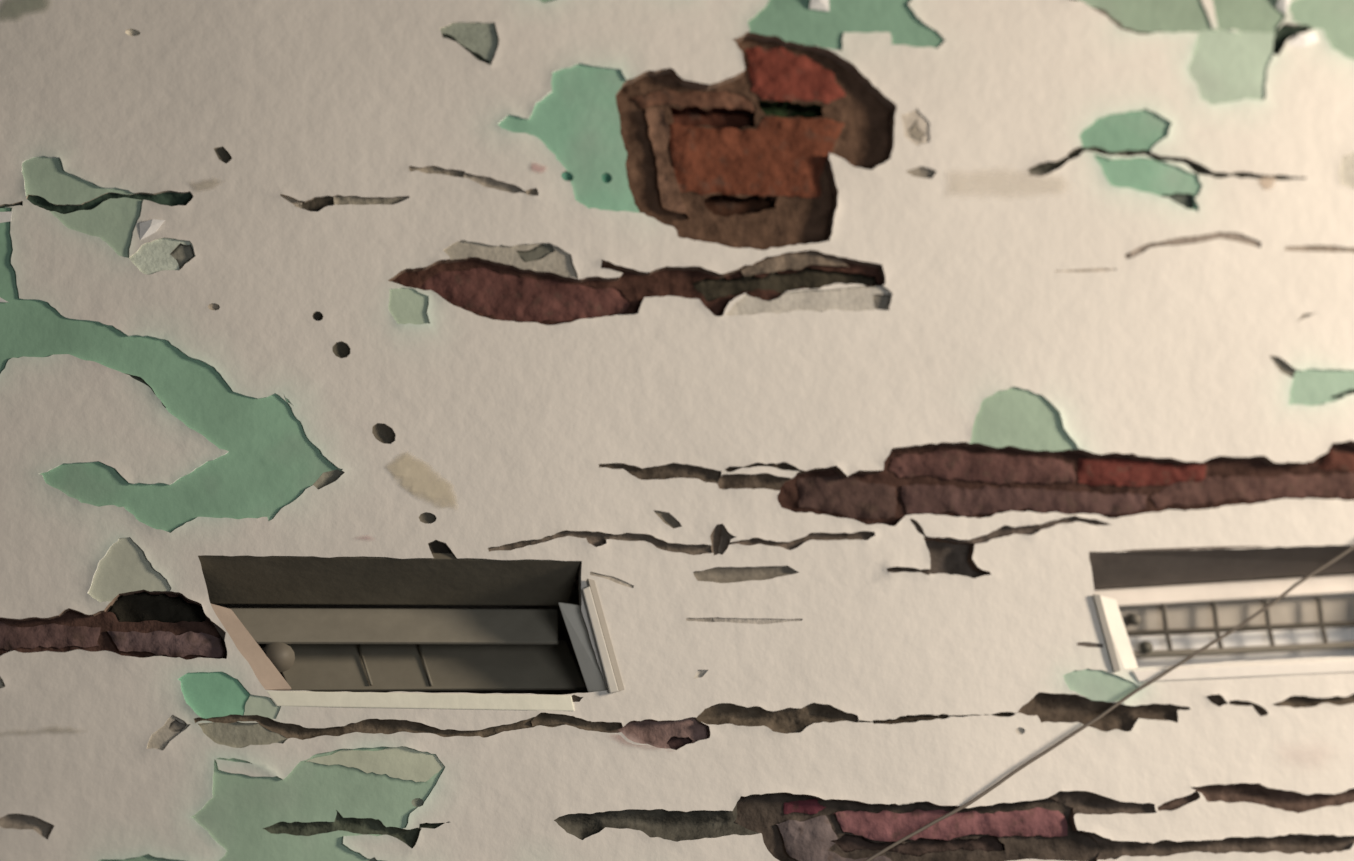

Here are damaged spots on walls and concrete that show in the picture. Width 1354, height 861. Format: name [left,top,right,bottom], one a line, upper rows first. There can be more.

peeling [1076,0,1354,105]
flaking render [388,0,945,325]
crack [1028,146,1306,180]
peeling [0,207,345,533]
crack [599,462,805,490]
flaking render [777,387,1354,526]
crack [488,524,875,588]
crack [887,516,1112,575]
peeling [0,537,445,861]
crack [194,713,623,740]
crack [696,692,1354,734]
flaking render [735,792,1102,861]